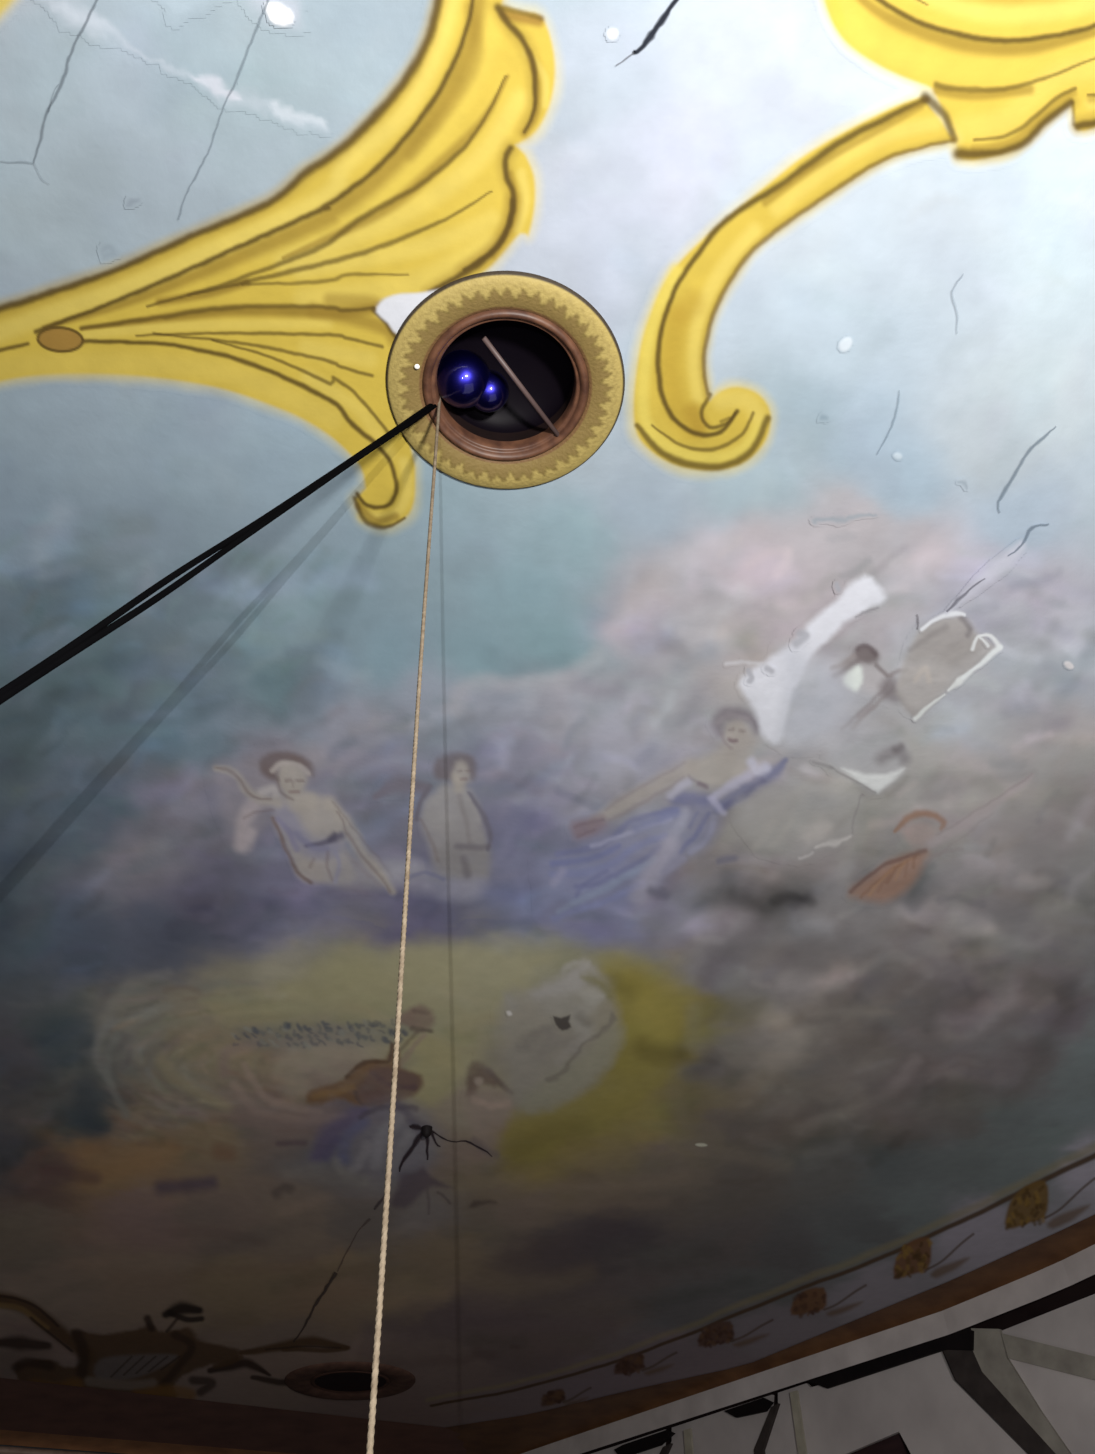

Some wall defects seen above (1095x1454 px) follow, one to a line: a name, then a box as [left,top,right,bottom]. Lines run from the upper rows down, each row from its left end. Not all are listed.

crack [617,0,678,65]
spalling [918,537,1030,633]
peeling [722,571,890,758]
spalling [910,632,1005,723]
crack [293,1125,492,1342]